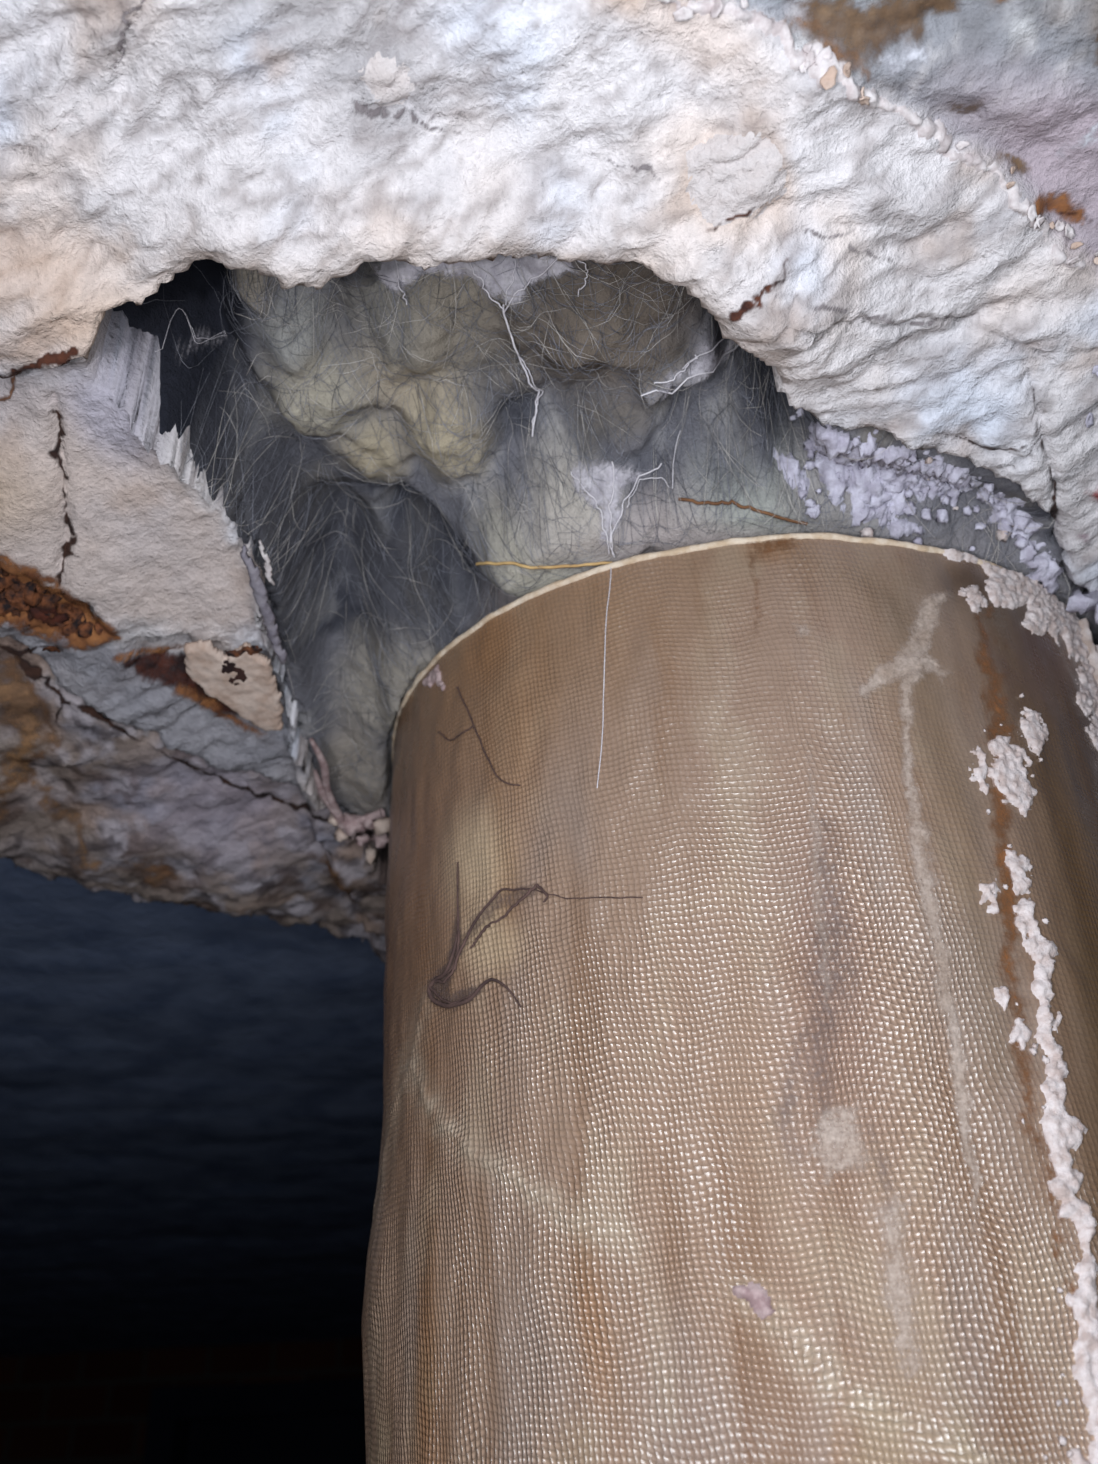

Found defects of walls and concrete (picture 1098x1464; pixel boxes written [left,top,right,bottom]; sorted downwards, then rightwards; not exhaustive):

crack [0,347,78,401]
crack [49,410,77,586]
rust [0,555,256,732]
crack [0,646,328,822]
peeling [184,639,284,731]